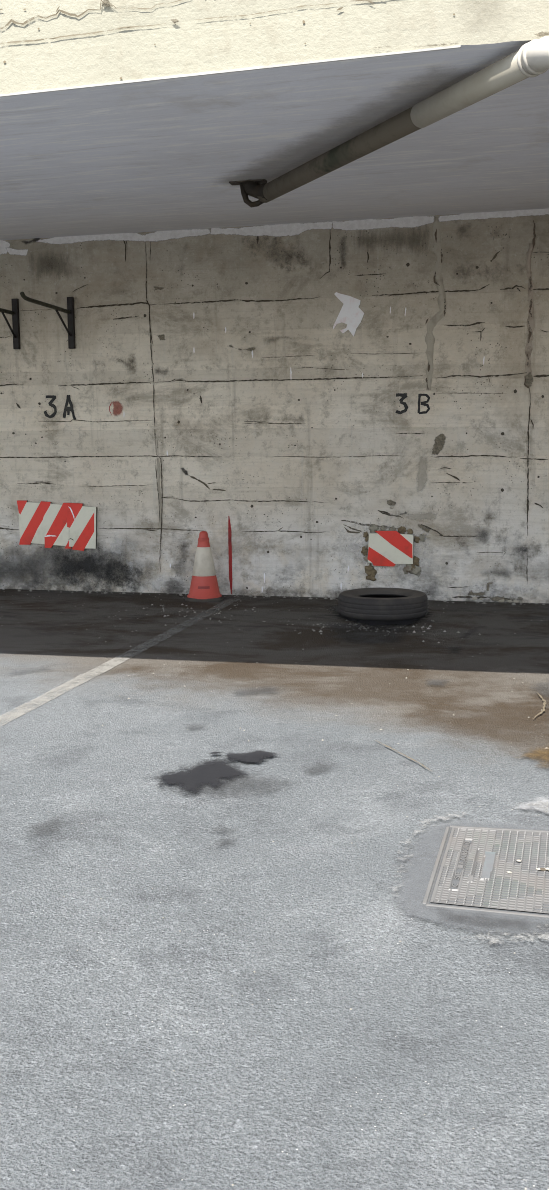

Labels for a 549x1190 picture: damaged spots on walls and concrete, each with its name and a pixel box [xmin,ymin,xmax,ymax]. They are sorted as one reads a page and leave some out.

crack [0,0,372,44]